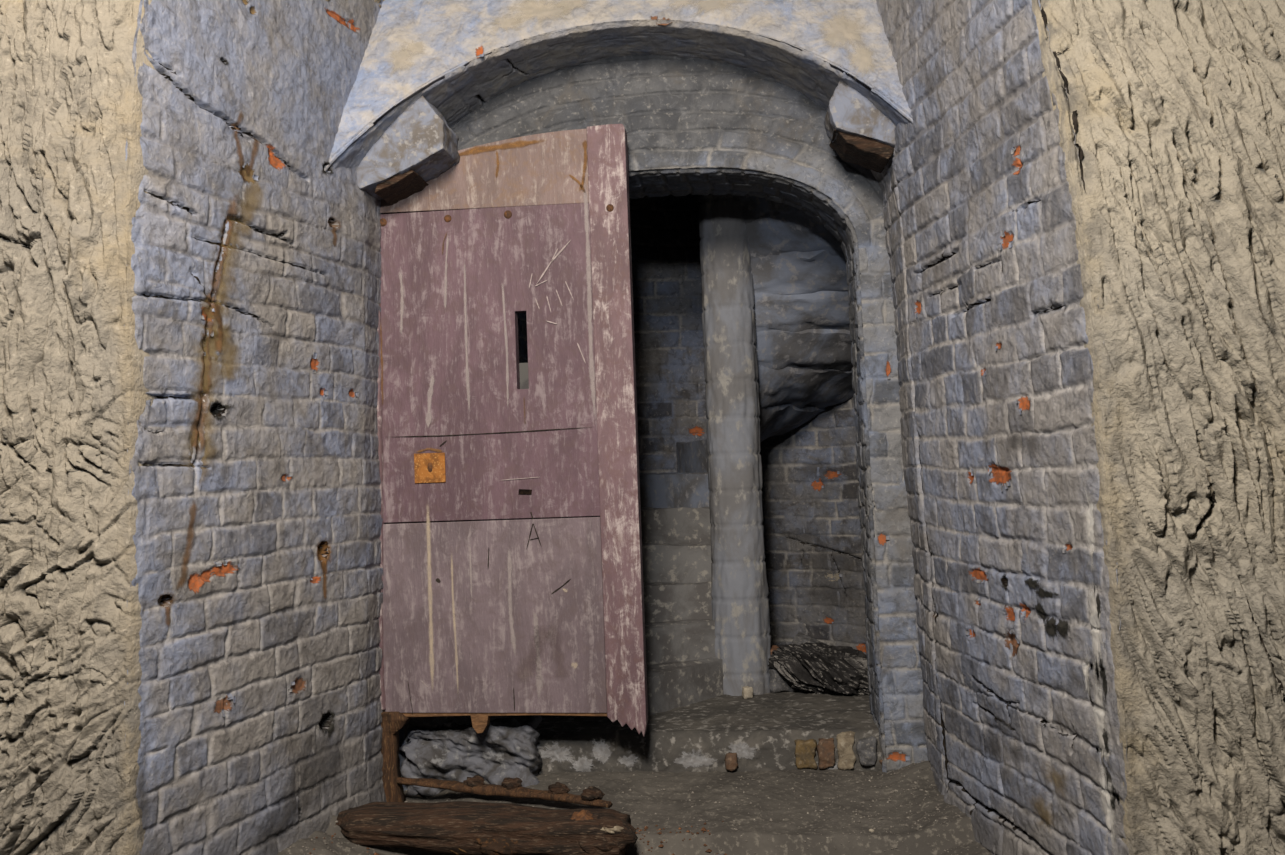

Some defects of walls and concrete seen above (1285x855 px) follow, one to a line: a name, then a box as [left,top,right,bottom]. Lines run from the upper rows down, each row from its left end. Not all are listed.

crack [1041,7,1086,192]
crack [0,236,38,267]
corrosion [190,112,259,468]
crack [1036,304,1065,314]
corrosion [178,505,196,587]
damp [1025,578,1070,640]